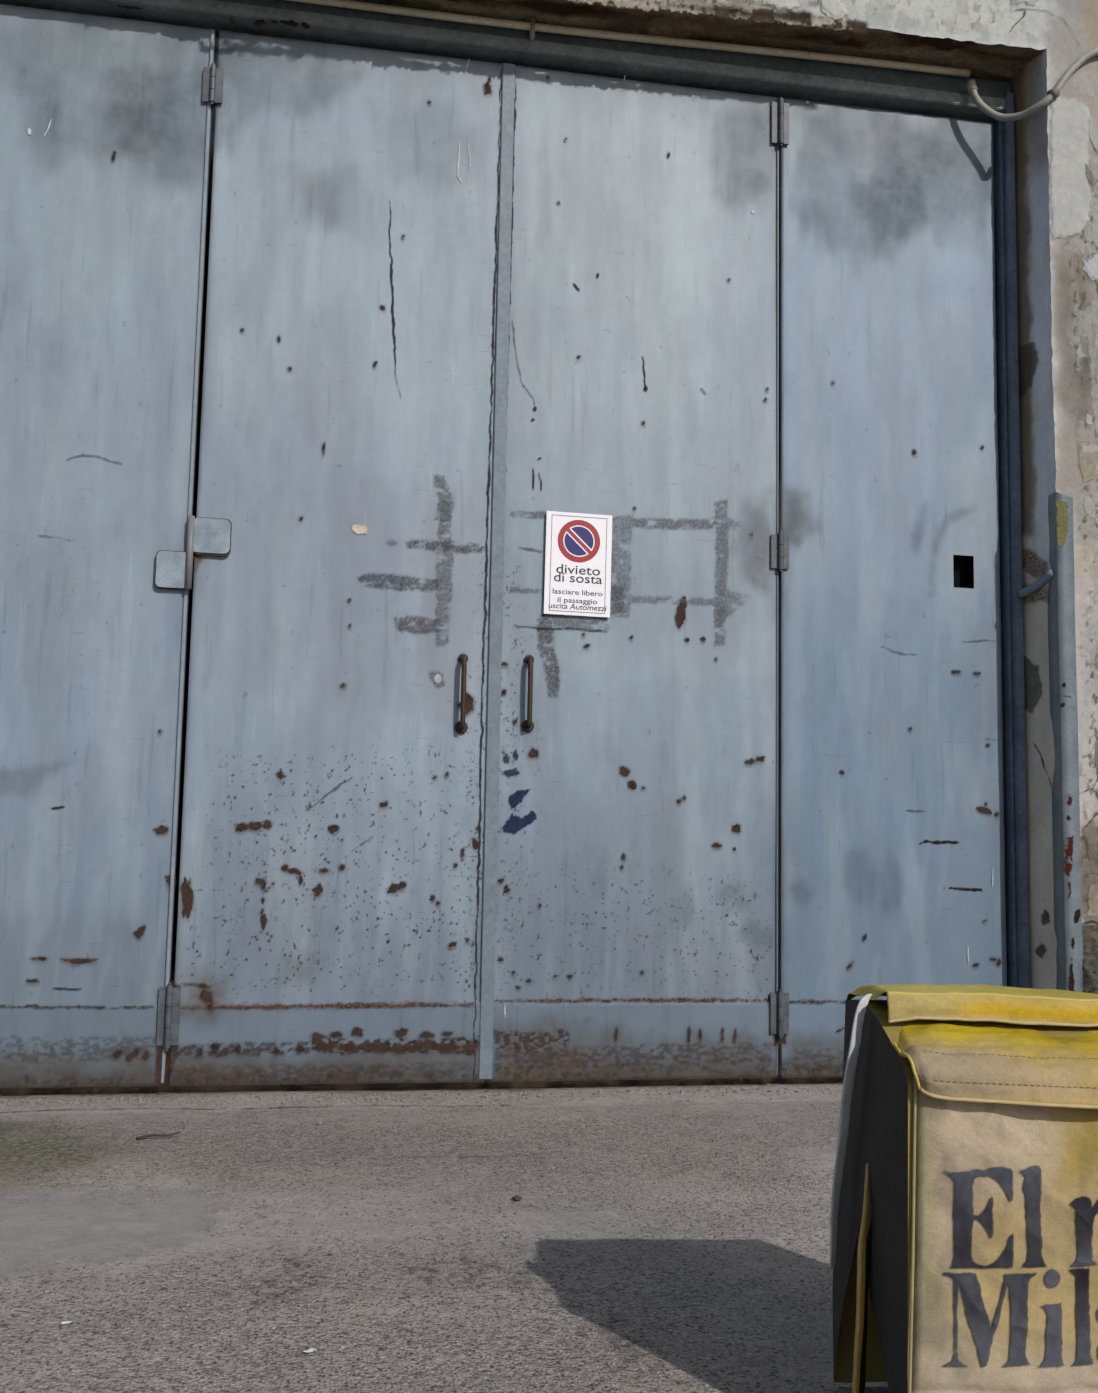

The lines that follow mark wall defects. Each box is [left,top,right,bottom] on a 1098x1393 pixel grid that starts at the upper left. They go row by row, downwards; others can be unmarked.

rust [1064,795,1081,991]
rust [0,1004,158,1018]
rust [114,1045,177,1088]
rust [494,1030,578,1073]
rust [774,1034,787,1045]